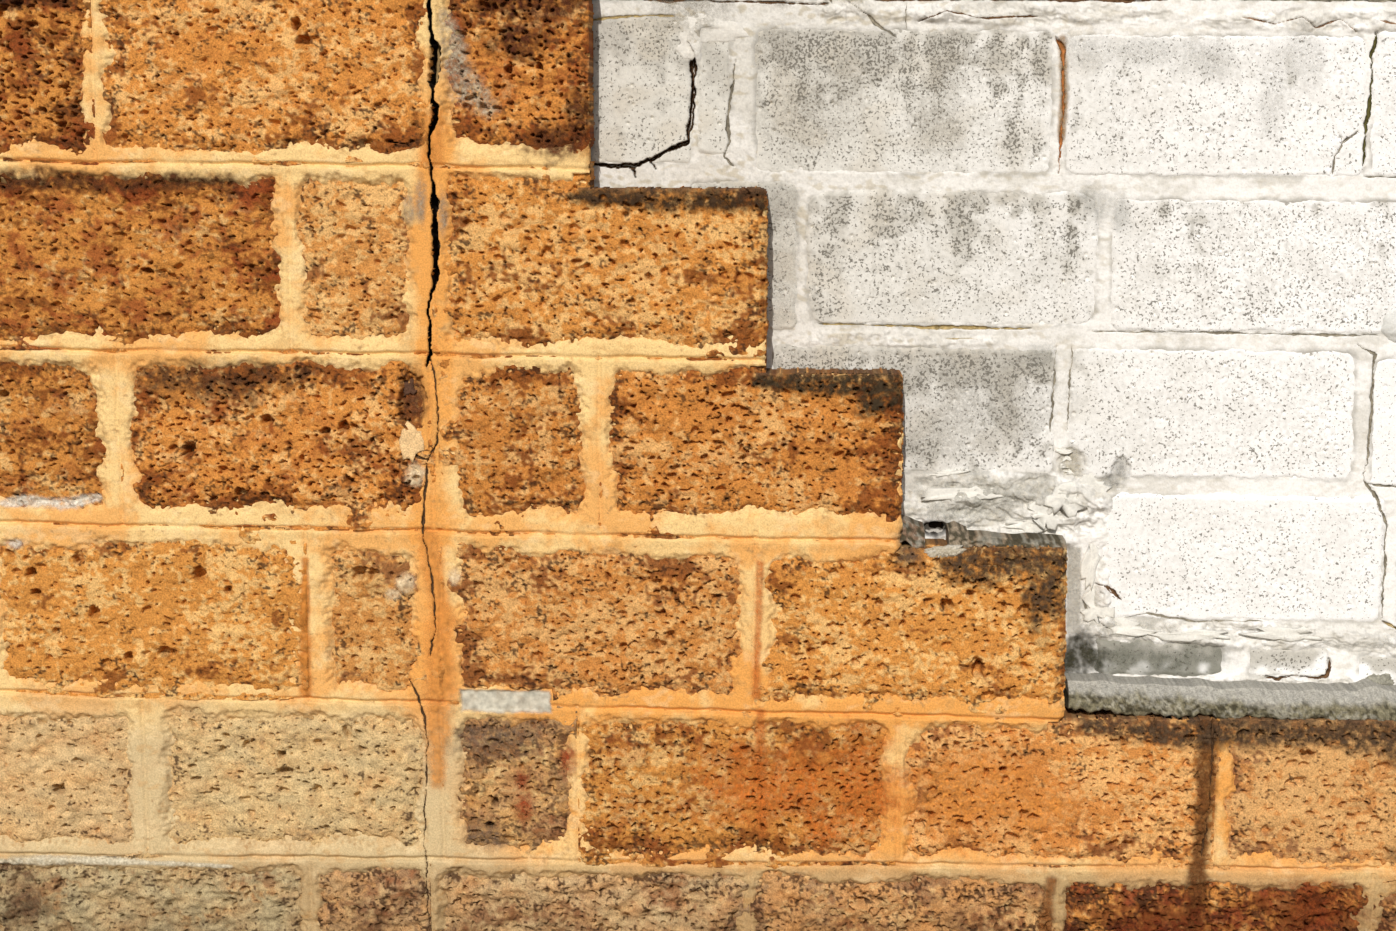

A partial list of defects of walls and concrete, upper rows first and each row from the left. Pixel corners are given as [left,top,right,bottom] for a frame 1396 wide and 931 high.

crack [593,0,1162,176]
corrosion [1058,37,1067,140]
crack [1244,0,1396,178]
crack [390,0,441,655]
peeling [899,448,1125,563]
crack [410,681,431,931]